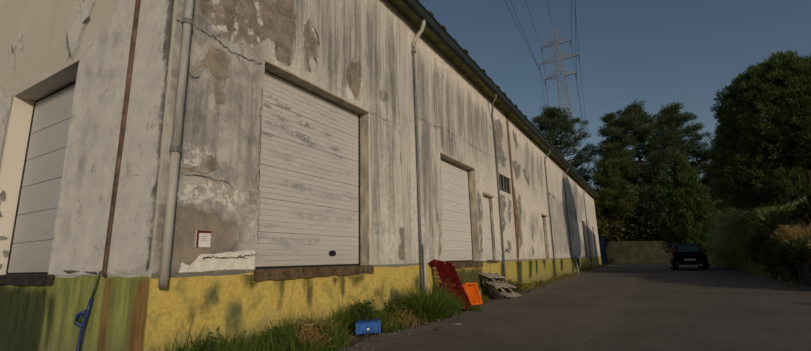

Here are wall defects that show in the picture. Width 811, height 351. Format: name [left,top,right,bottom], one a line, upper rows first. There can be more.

crack [177,20,265,65]
peeling [193,0,319,72]
peeling [345,56,366,100]
peeling [48,0,258,275]
crack [203,87,263,259]
leakage [397,11,410,235]
leakage [443,76,467,161]
peeling [495,120,529,184]
peeling [500,194,534,255]